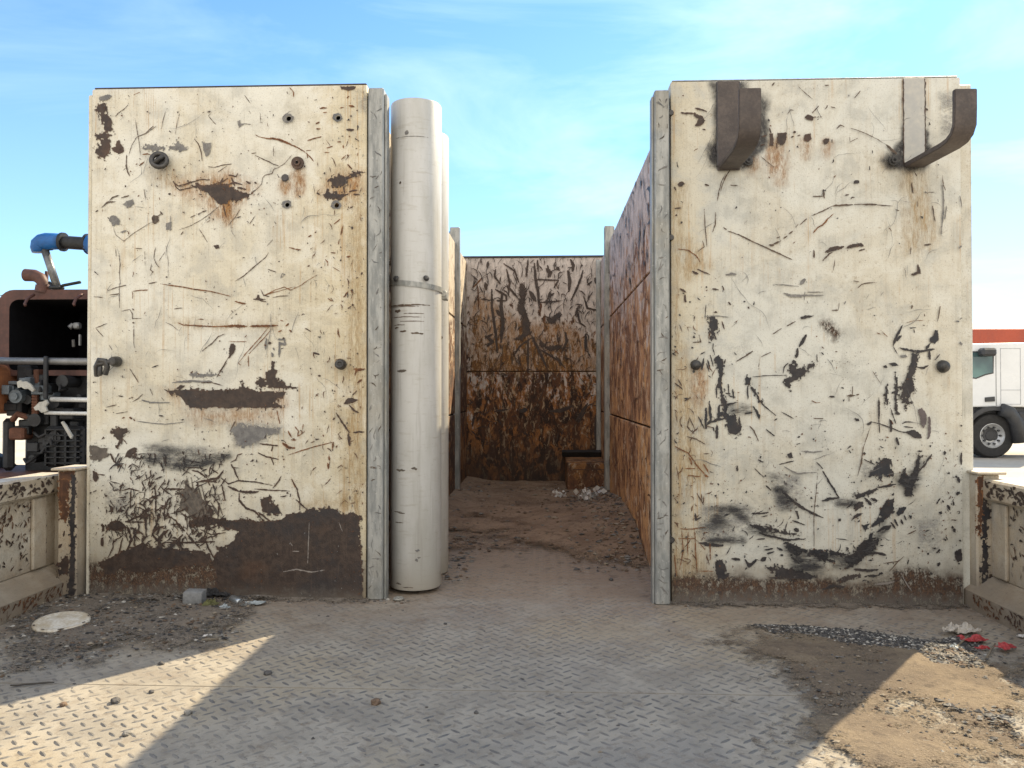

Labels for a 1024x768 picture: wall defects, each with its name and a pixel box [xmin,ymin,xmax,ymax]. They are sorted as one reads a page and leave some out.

peeling [94,101,124,161]
spalling [173,173,257,216]
peeling [164,343,298,448]
corrosion [473,299,596,370]
peeling [698,307,818,439]
peeling [0,476,54,502]
peeling [55,472,78,596]
corrosion [88,534,233,598]
peeling [699,330,946,590]
corrosion [672,544,1024,632]
peeling [979,481,1024,584]